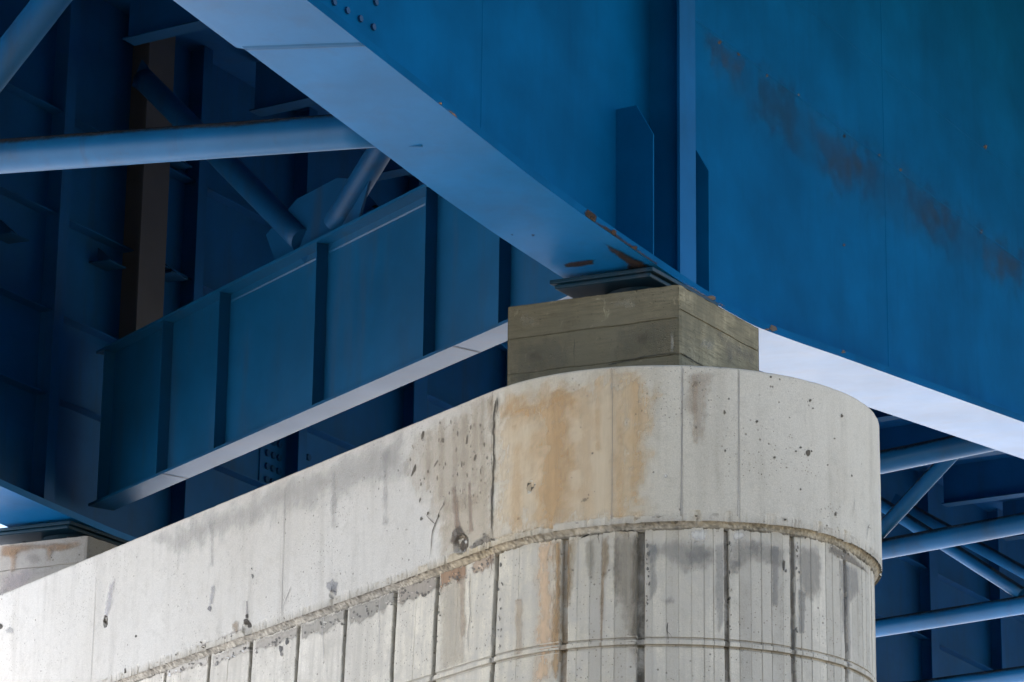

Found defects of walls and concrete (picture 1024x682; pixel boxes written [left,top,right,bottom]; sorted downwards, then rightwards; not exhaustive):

rust [585,209,657,270]
rust [503,384,641,521]